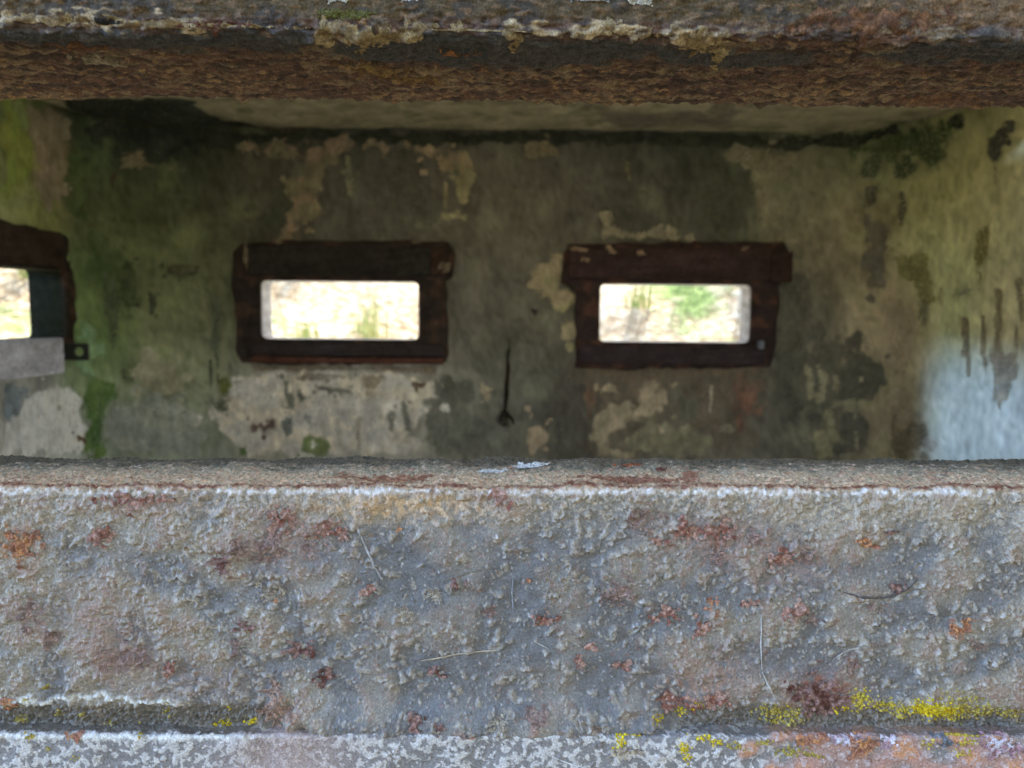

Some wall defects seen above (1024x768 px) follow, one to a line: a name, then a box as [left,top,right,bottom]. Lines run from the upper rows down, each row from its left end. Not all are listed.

leakage [61,97,920,168]
peeling [236,132,389,240]
peeling [403,140,478,221]
leakage [960,276,1024,410]
peeling [183,364,493,459]
peeling [588,378,735,459]
rust [0,525,46,570]
rust [780,651,904,763]